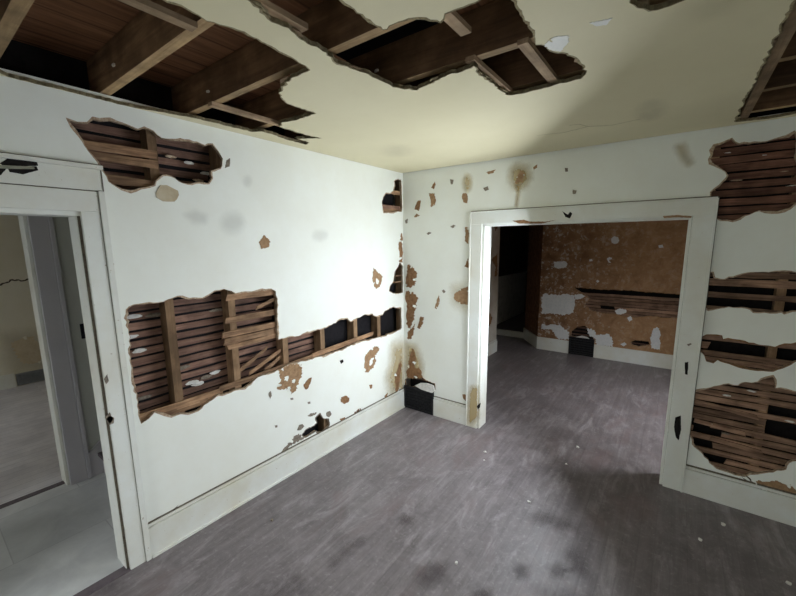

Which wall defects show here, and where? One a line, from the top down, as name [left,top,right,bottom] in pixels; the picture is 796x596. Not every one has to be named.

peeling [544,35,569,52]
flaking render [66,116,230,193]
flaking render [708,130,796,222]
flaking render [382,179,436,223]
flaking render [573,287,680,318]
flaking render [706,270,796,314]
flaking render [124,233,424,424]
flaking render [384,349,435,397]
flaking render [690,334,796,497]